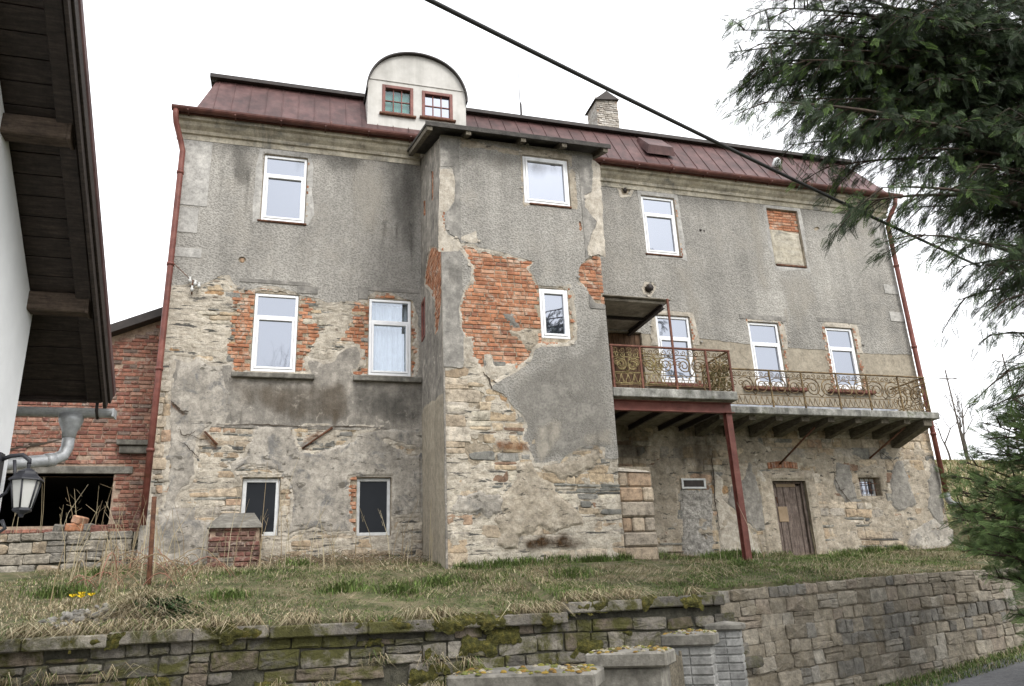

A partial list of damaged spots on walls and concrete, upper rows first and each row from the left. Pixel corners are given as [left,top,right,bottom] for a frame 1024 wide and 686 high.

spalling [148,275,423,562]
spalling [424,137,626,569]
flaking render [767,210,799,232]